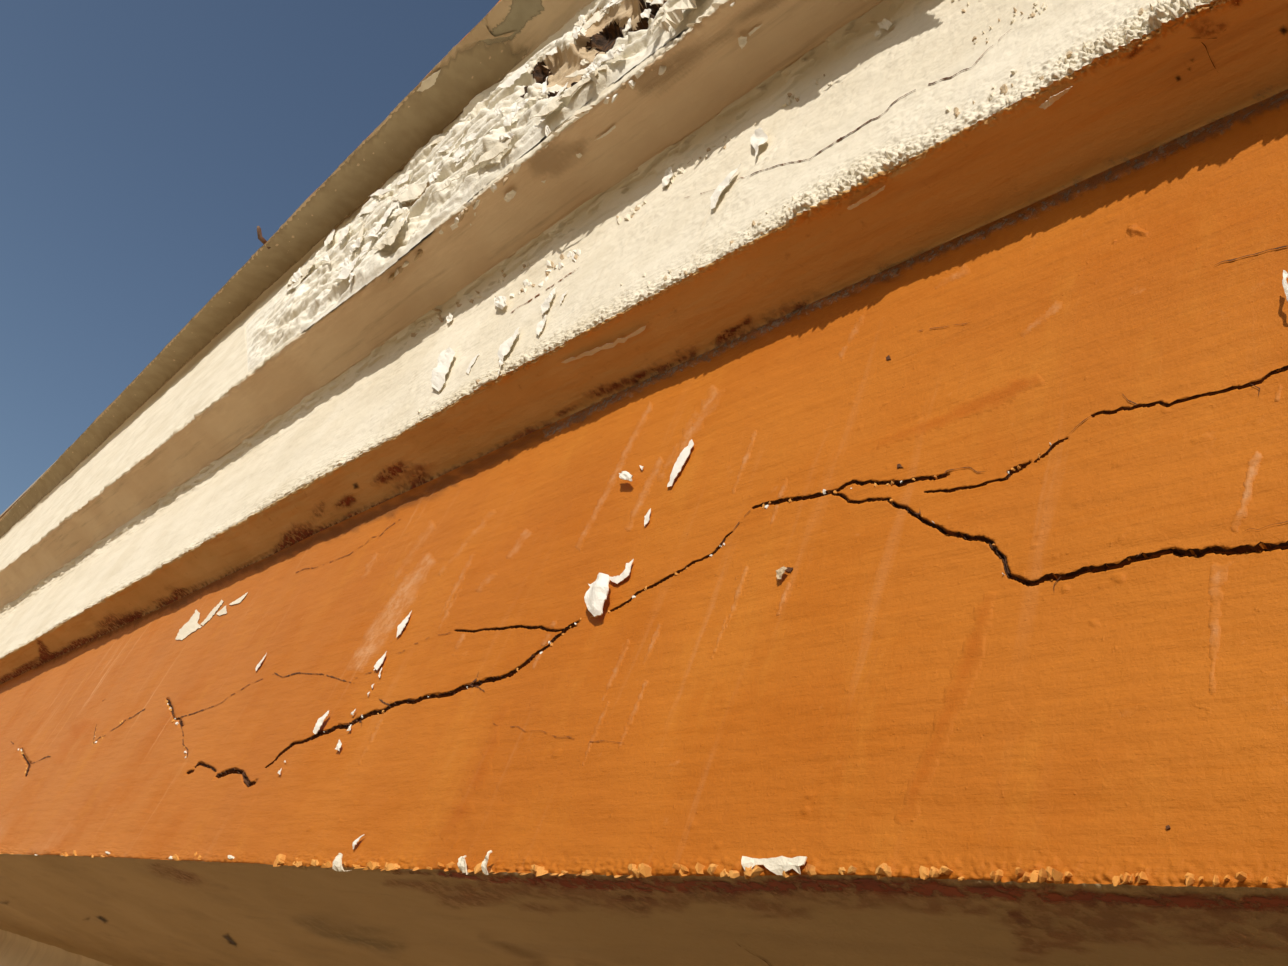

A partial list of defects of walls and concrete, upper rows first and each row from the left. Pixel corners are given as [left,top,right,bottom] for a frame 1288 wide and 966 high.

peeling [710,122,768,210]
spalling [0,0,735,538]
peeling [584,559,634,617]
crack [92,365,1288,787]
peeling [176,592,248,640]
peeling [396,610,412,638]
peeling [367,651,387,695]
peeling [313,711,329,734]
peeling [614,863,652,878]
peeling [672,856,817,880]
peeling [919,866,965,881]
peeling [990,866,1073,884]